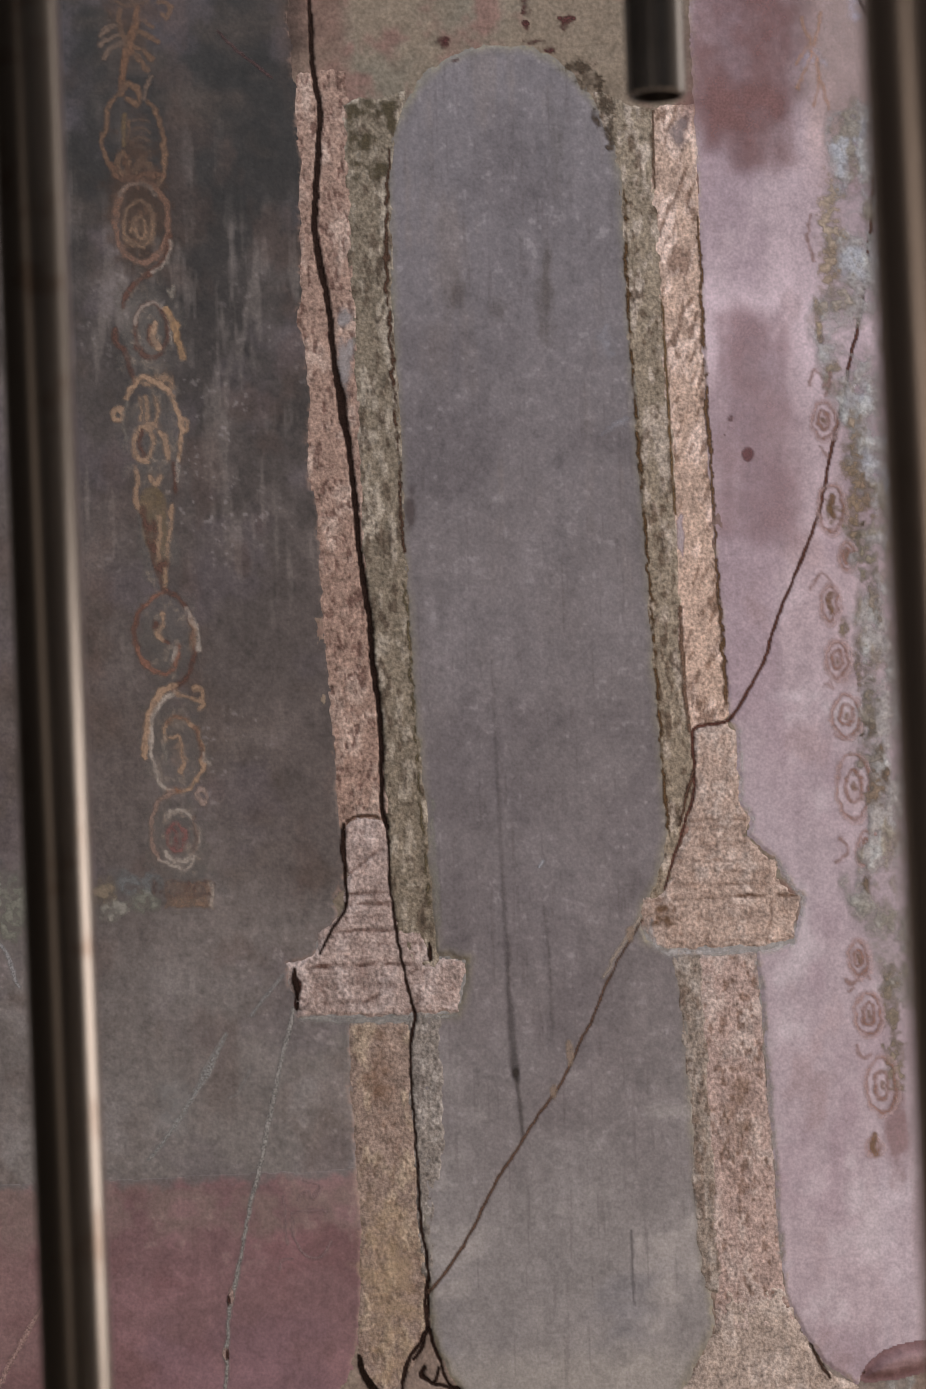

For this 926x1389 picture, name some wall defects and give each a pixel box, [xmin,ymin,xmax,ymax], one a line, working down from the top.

peeling [319,91,439,967]
crack [308,0,643,1389]
spalling [696,216,728,705]
crack [664,289,865,890]
crack [223,978,302,1389]
spalling [292,968,300,1010]
spalling [357,1354,379,1389]
peeling [404,1012,445,1279]
peeling [672,949,722,1293]
spalling [809,1342,831,1378]